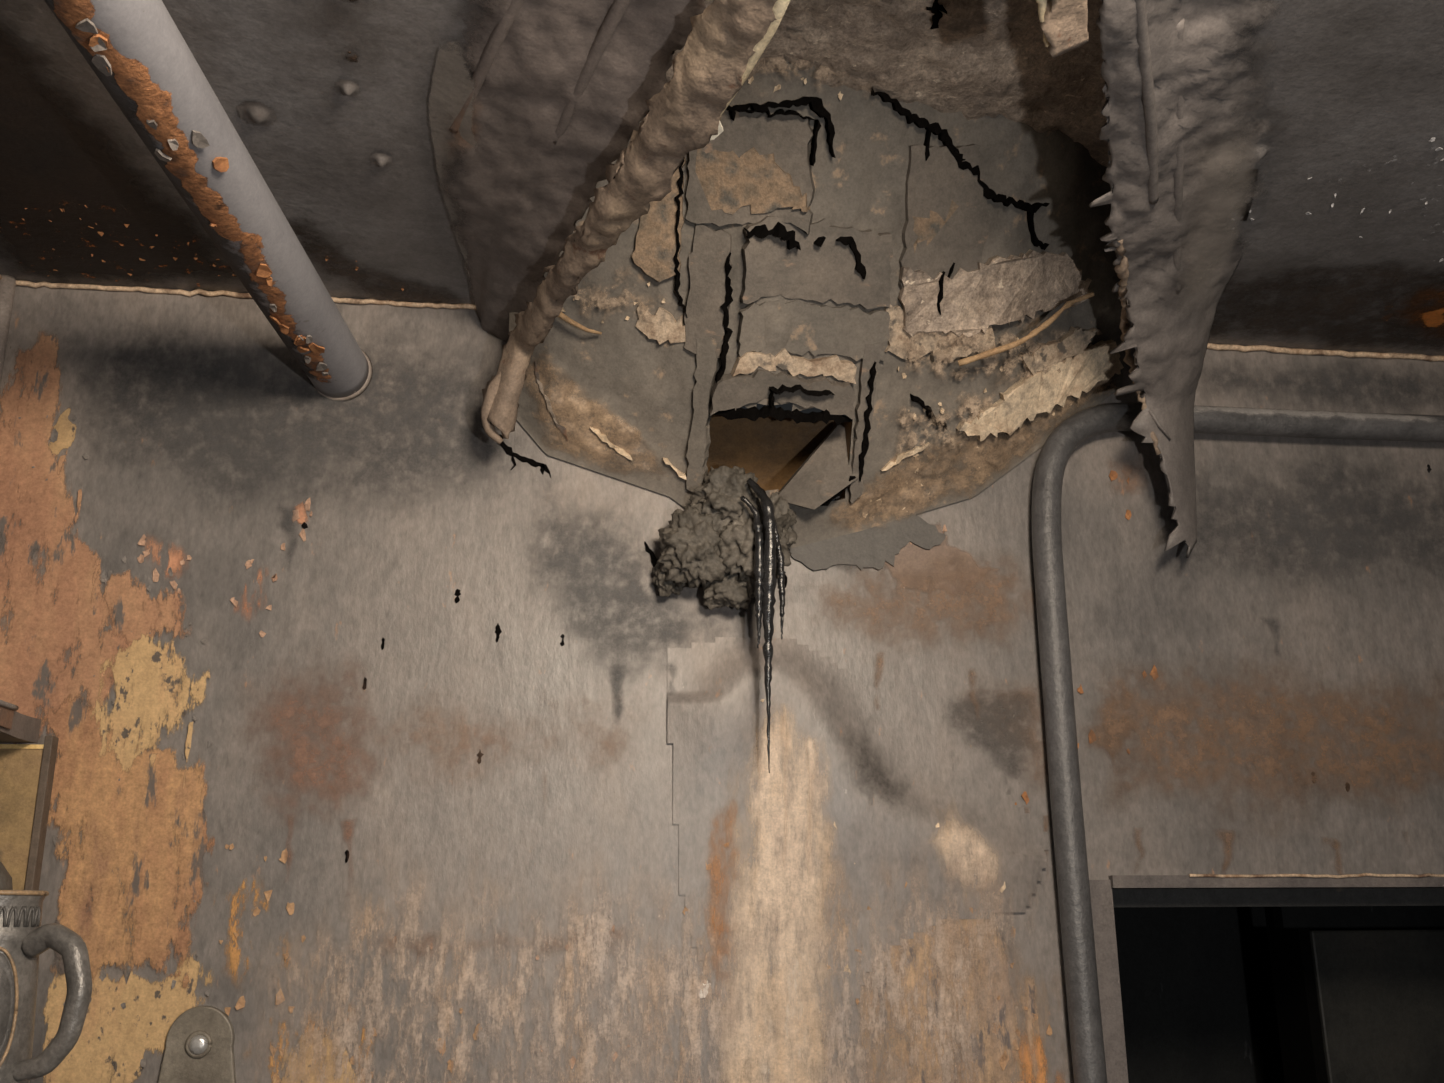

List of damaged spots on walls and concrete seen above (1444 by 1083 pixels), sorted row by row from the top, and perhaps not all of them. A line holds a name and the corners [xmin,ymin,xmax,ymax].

corrosion [0,0,332,383]
crack [673,160,687,317]
crack [726,97,836,166]
crack [714,222,876,506]
crack [937,262,955,315]
crack [870,87,1050,250]
corrosion [1422,308,1444,327]
peeling [230,559,278,612]
peeling [0,332,234,1083]
peeling [225,996,245,1016]
peeling [219,881,272,976]
damp [288,706,1052,1083]